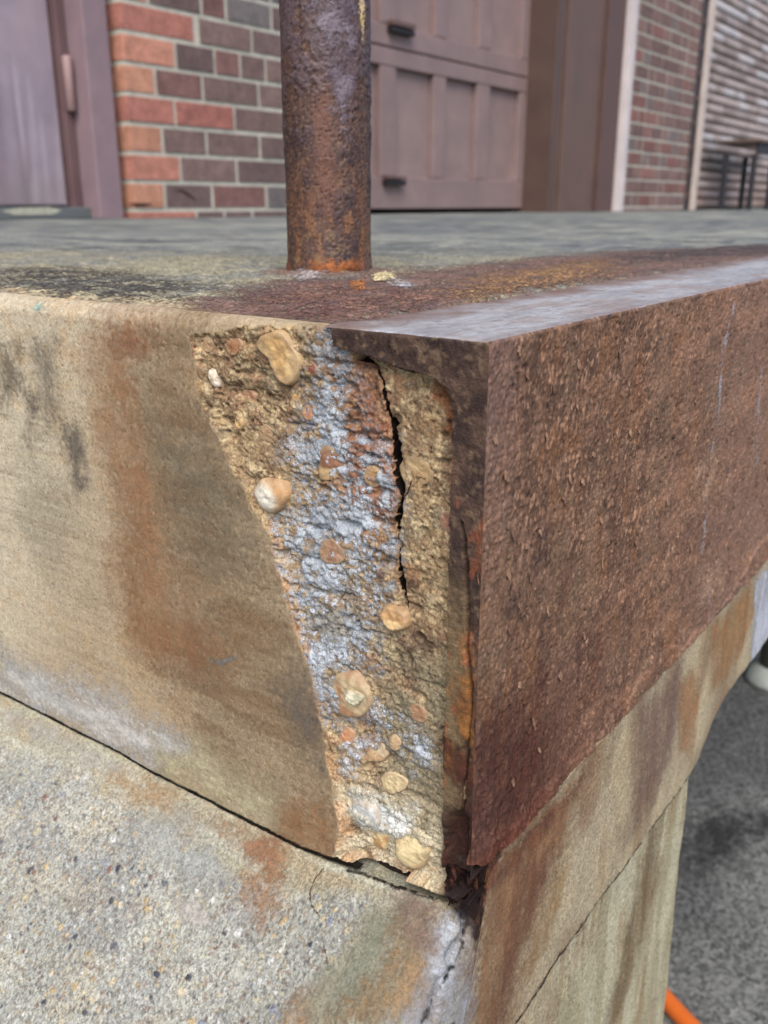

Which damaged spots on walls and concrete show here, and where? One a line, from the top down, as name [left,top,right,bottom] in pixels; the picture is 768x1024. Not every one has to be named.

corrosion [166,245,768,323]
crack [360,355,436,608]
spalling [187,324,487,903]
corrosion [712,589,754,685]
crack [0,692,437,918]
corrosion [441,673,474,864]
crack [612,769,694,882]
corrosion [634,665,698,820]